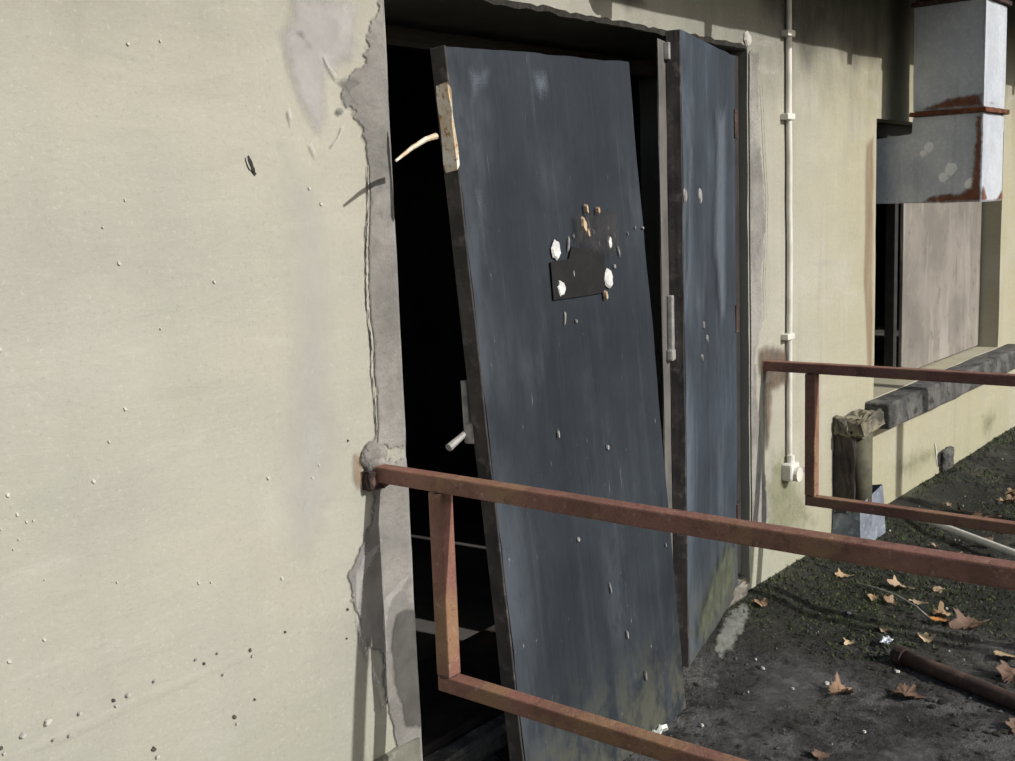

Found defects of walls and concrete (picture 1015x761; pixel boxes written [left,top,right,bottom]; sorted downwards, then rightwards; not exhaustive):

corrosion [927,95,1002,203]
crack [366,168,380,441]
spalling [356,441,389,492]
flaking render [356,544,379,601]
flaking render [383,576,408,633]